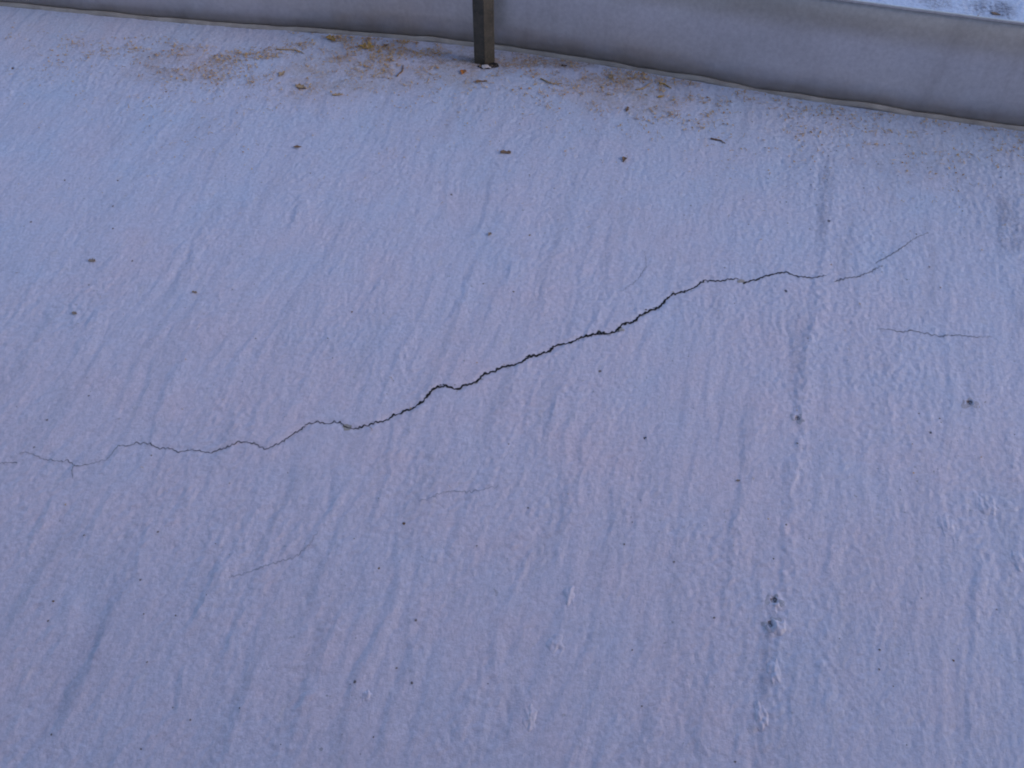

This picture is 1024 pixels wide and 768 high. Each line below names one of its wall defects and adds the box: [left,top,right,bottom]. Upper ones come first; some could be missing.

crack [0,232,928,476]